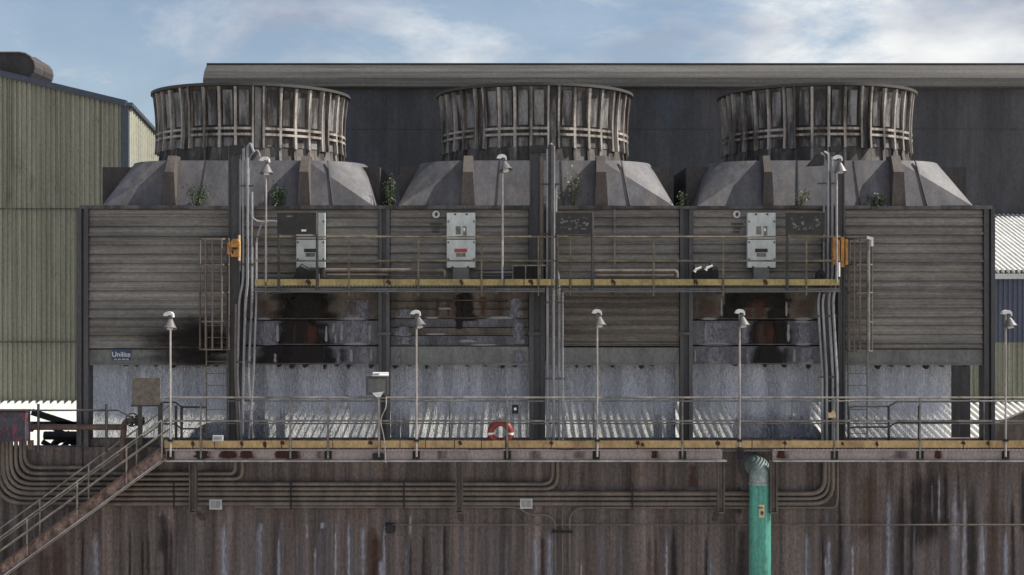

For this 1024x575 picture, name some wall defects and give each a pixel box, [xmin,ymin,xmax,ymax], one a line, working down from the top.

damp [255,293,344,363]
damp [721,293,791,363]
rust [194,451,253,459]
rust [274,451,299,459]
damp [82,538,98,575]
damp [278,519,365,575]
rust [370,535,379,575]
damp [886,478,985,575]
damp [1004,478,1024,575]